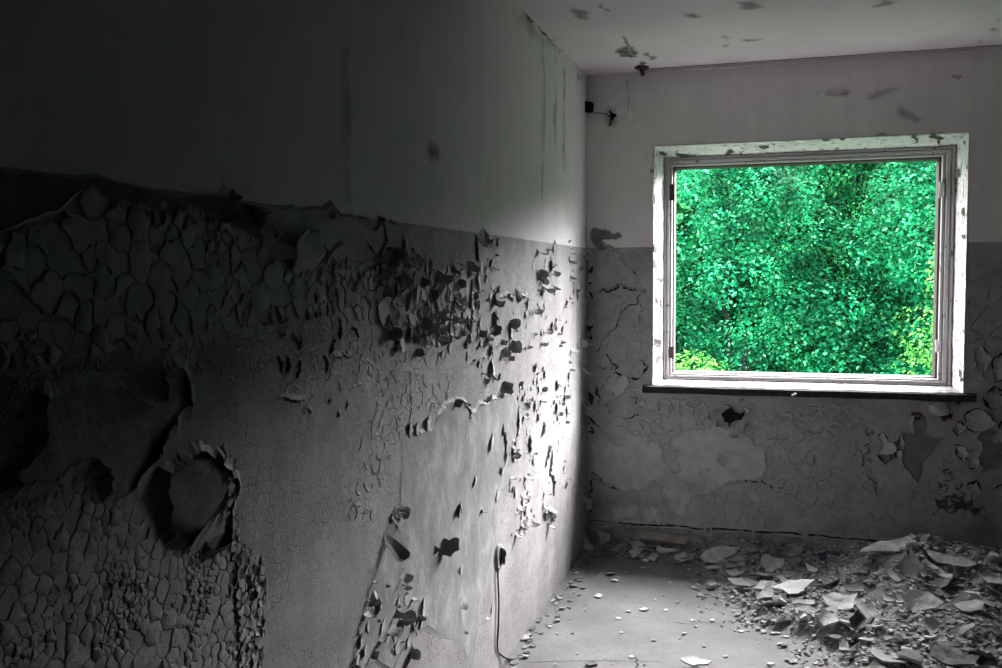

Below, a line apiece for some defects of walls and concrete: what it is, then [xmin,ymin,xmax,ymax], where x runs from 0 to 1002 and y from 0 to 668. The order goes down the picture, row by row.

peeling [615,46,658,60]
crack [595,241,646,354]
flaking render [0,169,769,668]
peeling [877,344,1002,521]